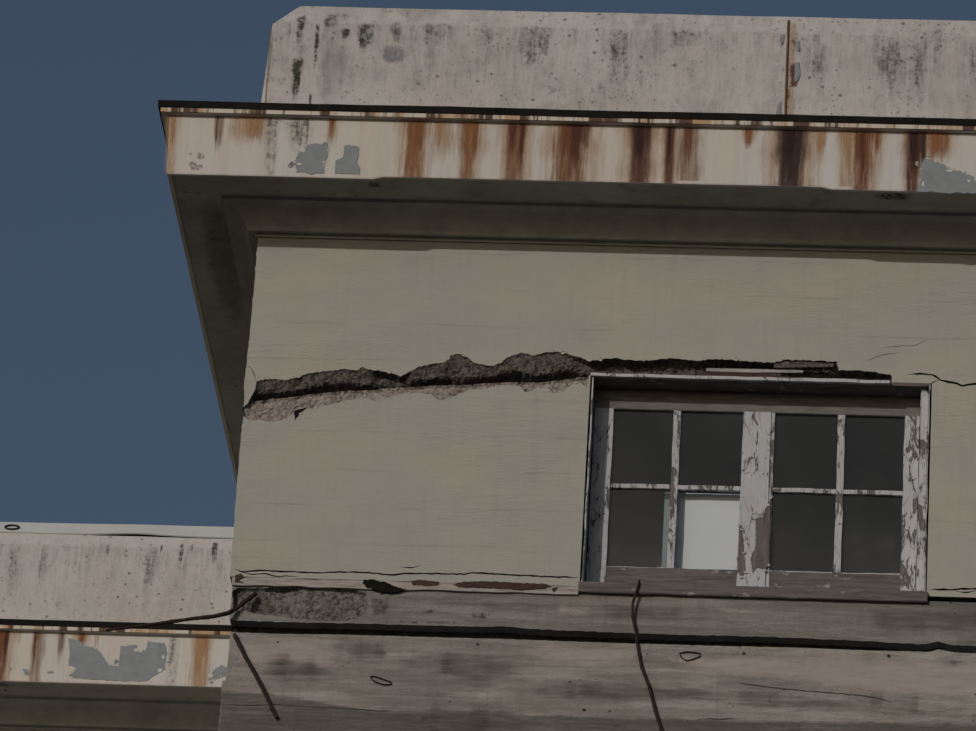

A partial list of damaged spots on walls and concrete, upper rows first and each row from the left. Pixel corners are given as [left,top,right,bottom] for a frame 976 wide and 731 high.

water stain [292,15,335,94]
water stain [342,25,373,46]
corrosion [503,123,528,179]
corrosion [624,126,697,183]
corrosion [771,130,825,186]
corrosion [903,133,950,191]
peeling [915,155,976,194]
spalling [242,350,892,422]
crack [864,340,976,390]
peeling [735,495,773,579]
spalling [106,573,439,631]
peeling [68,638,173,682]